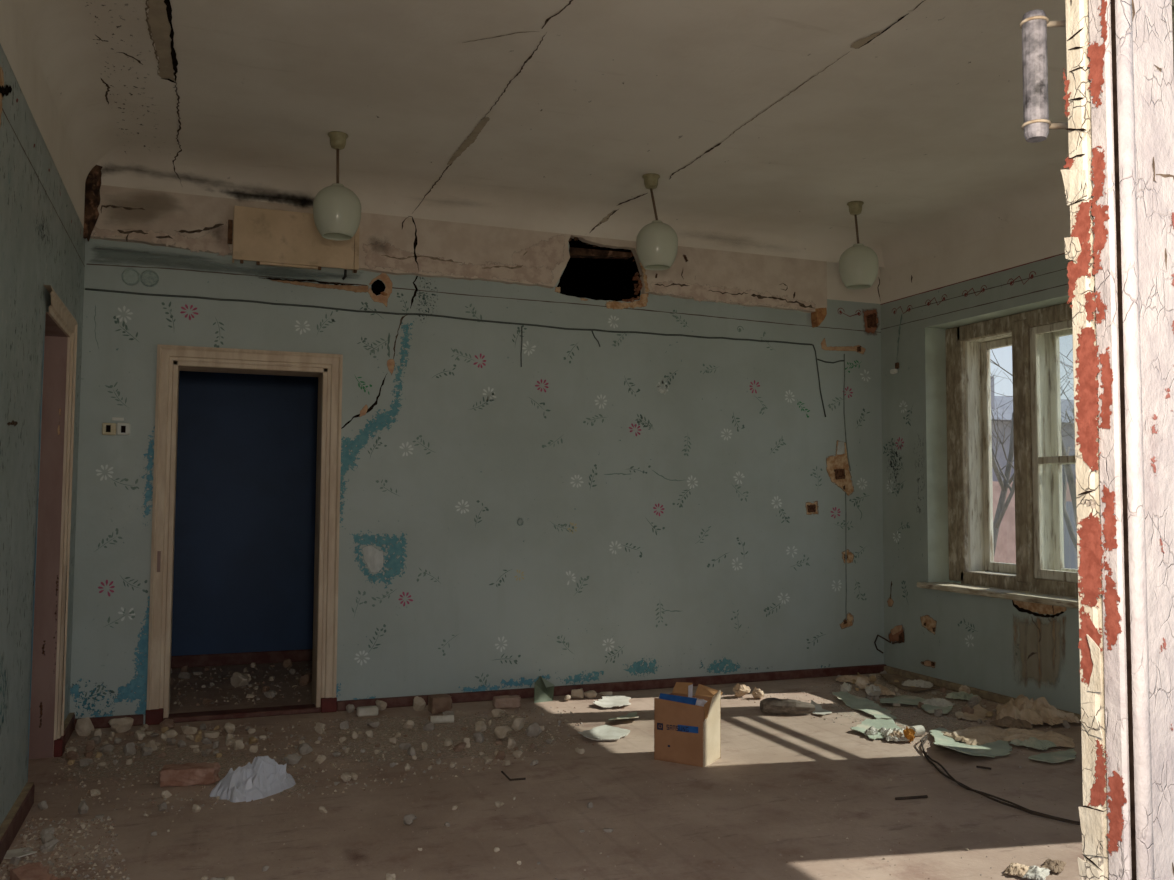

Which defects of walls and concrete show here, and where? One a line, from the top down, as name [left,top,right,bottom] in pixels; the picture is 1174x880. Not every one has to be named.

crack [96,0,182,179]
crack [590,0,925,232]
peeling [1063,69,1071,117]
peeling [1087,0,1108,108]
spalling [264,273,392,307]
crack [341,0,573,429]
spalling [555,237,827,328]
peeling [1061,146,1113,471]
peeling [340,277,436,588]
spalling [826,440,854,496]
peeling [1012,484,1122,692]
peeling [1078,716,1127,880]